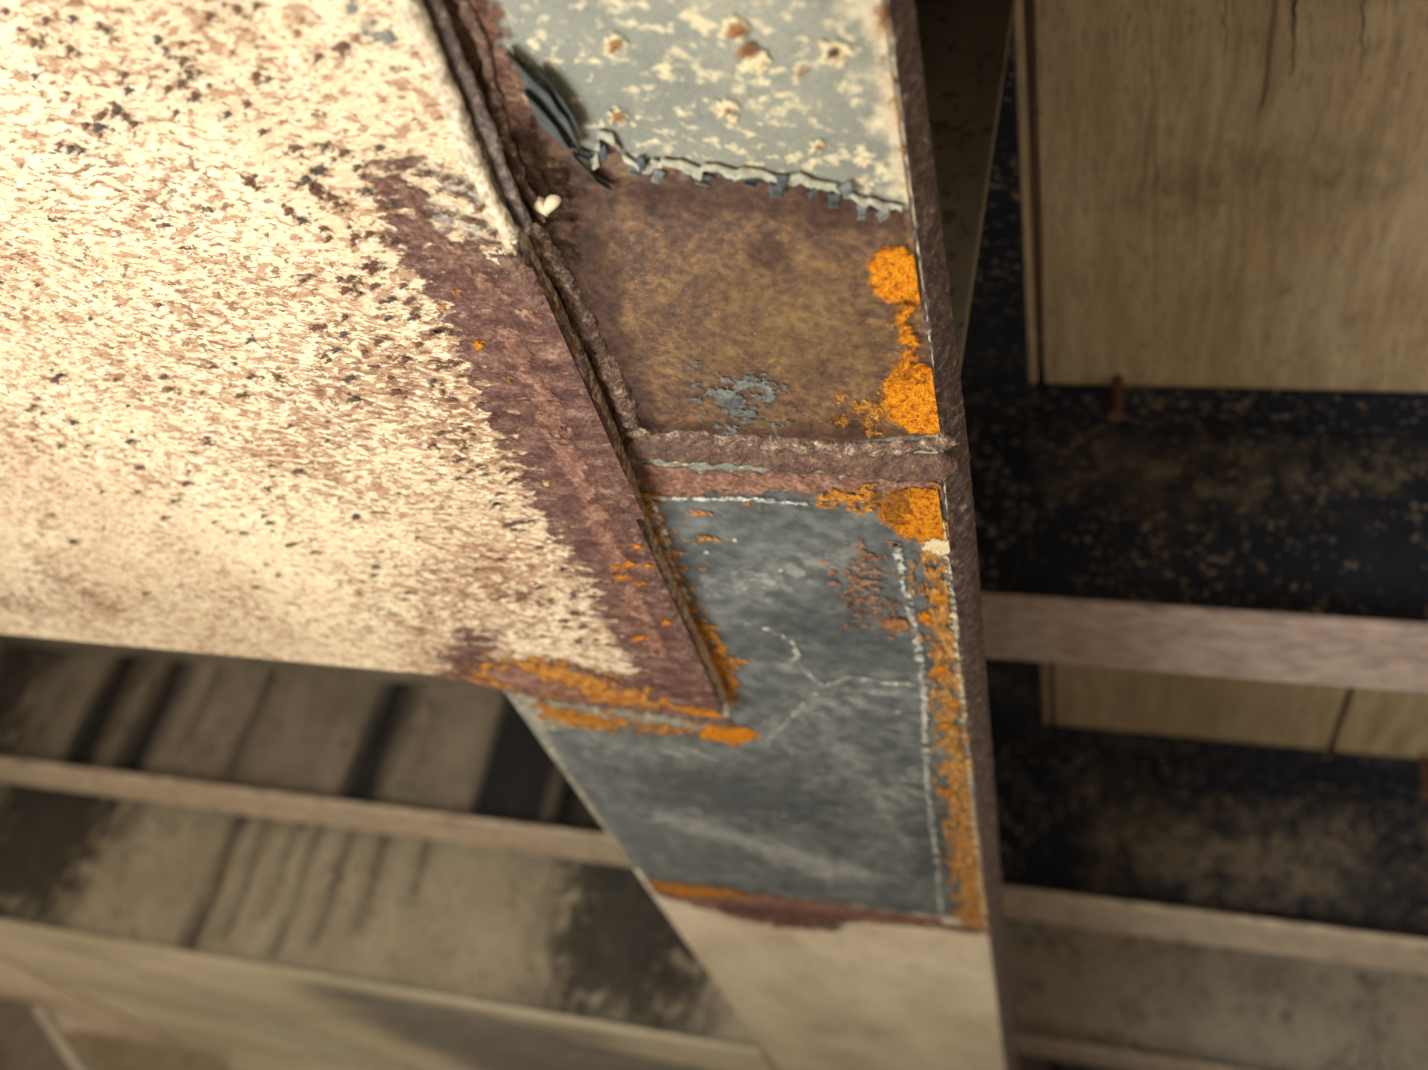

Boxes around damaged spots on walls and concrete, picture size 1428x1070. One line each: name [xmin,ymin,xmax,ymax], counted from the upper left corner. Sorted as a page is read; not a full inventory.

peeling [507,47,902,222]
rust [231,363,287,402]
rust [309,316,351,360]
rust [341,374,365,403]
rust [358,0,990,936]
leakage [1087,789,1372,916]